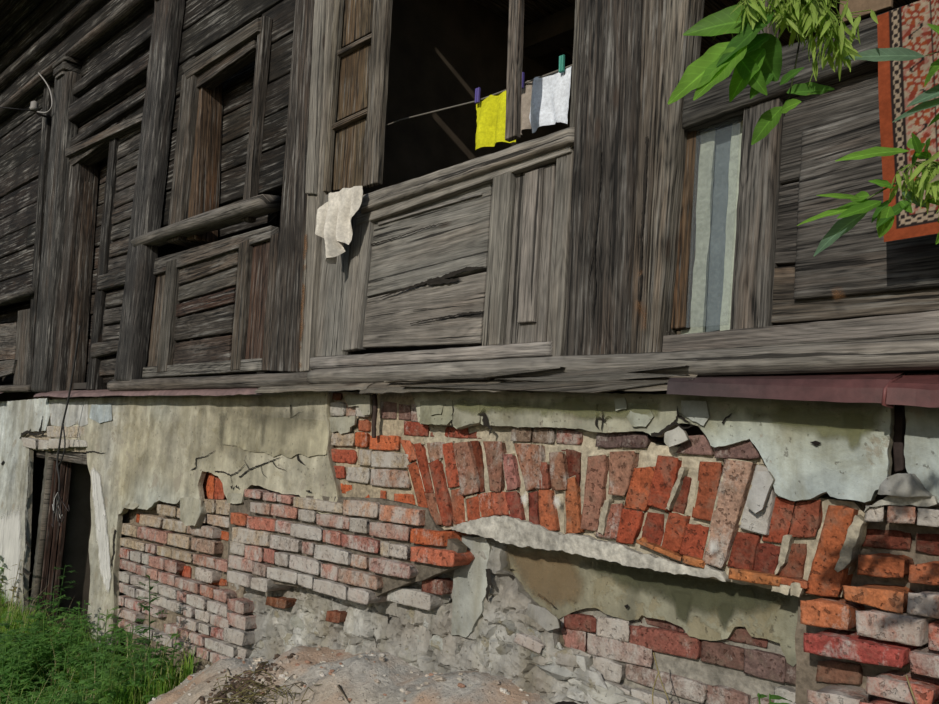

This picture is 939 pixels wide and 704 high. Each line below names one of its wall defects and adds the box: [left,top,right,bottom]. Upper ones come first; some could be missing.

crack [191,451,305,483]
spalling [116,391,939,704]